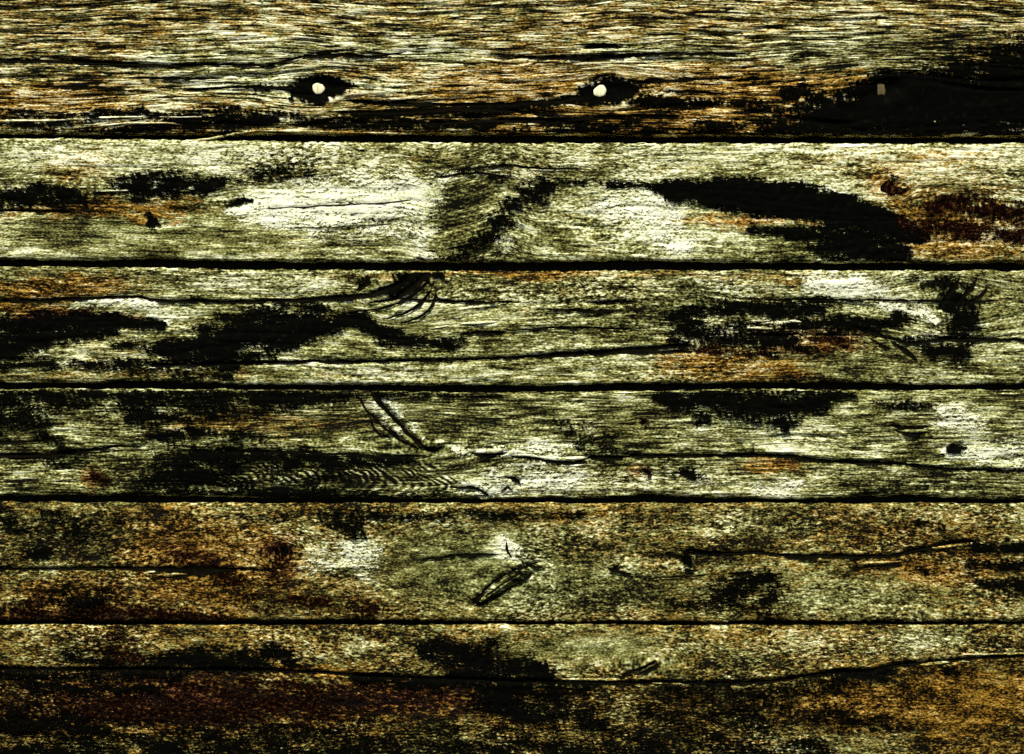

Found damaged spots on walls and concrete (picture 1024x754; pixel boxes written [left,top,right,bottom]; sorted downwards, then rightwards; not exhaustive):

leakage [0,29,1024,135]
leakage [386,163,1024,367]
leakage [0,272,587,542]
leakage [649,389,858,435]
crack [607,540,974,579]
crack [0,655,1024,703]